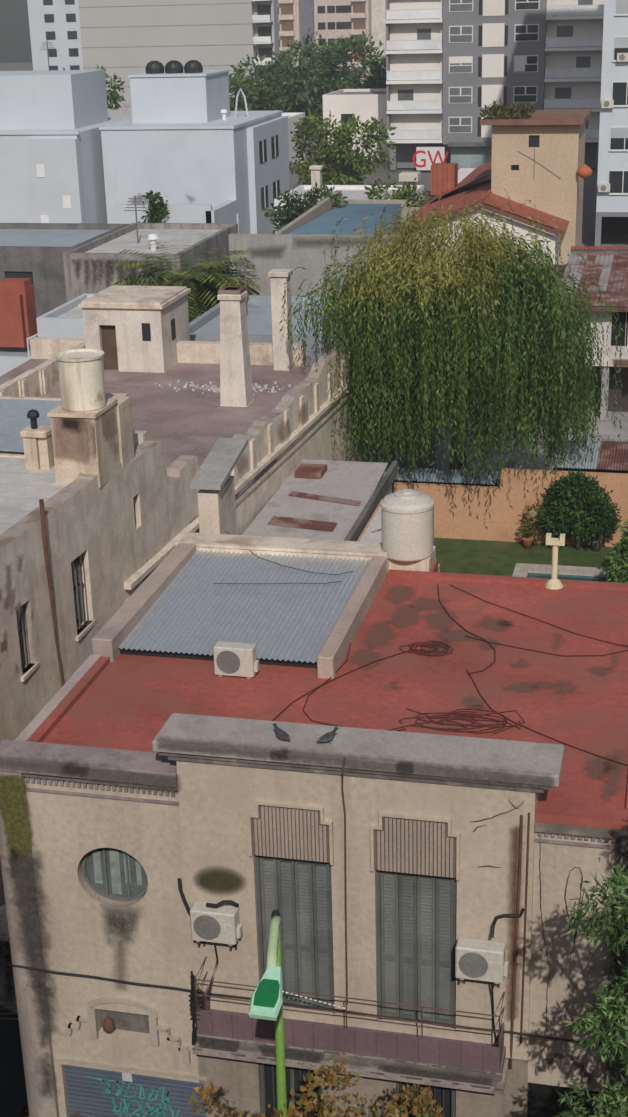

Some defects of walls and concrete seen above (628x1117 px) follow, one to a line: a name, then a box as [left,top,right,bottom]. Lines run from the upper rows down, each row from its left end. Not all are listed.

crack [472,800,524,832]
damp [0,857,53,1044]
crack [539,844,600,1028]